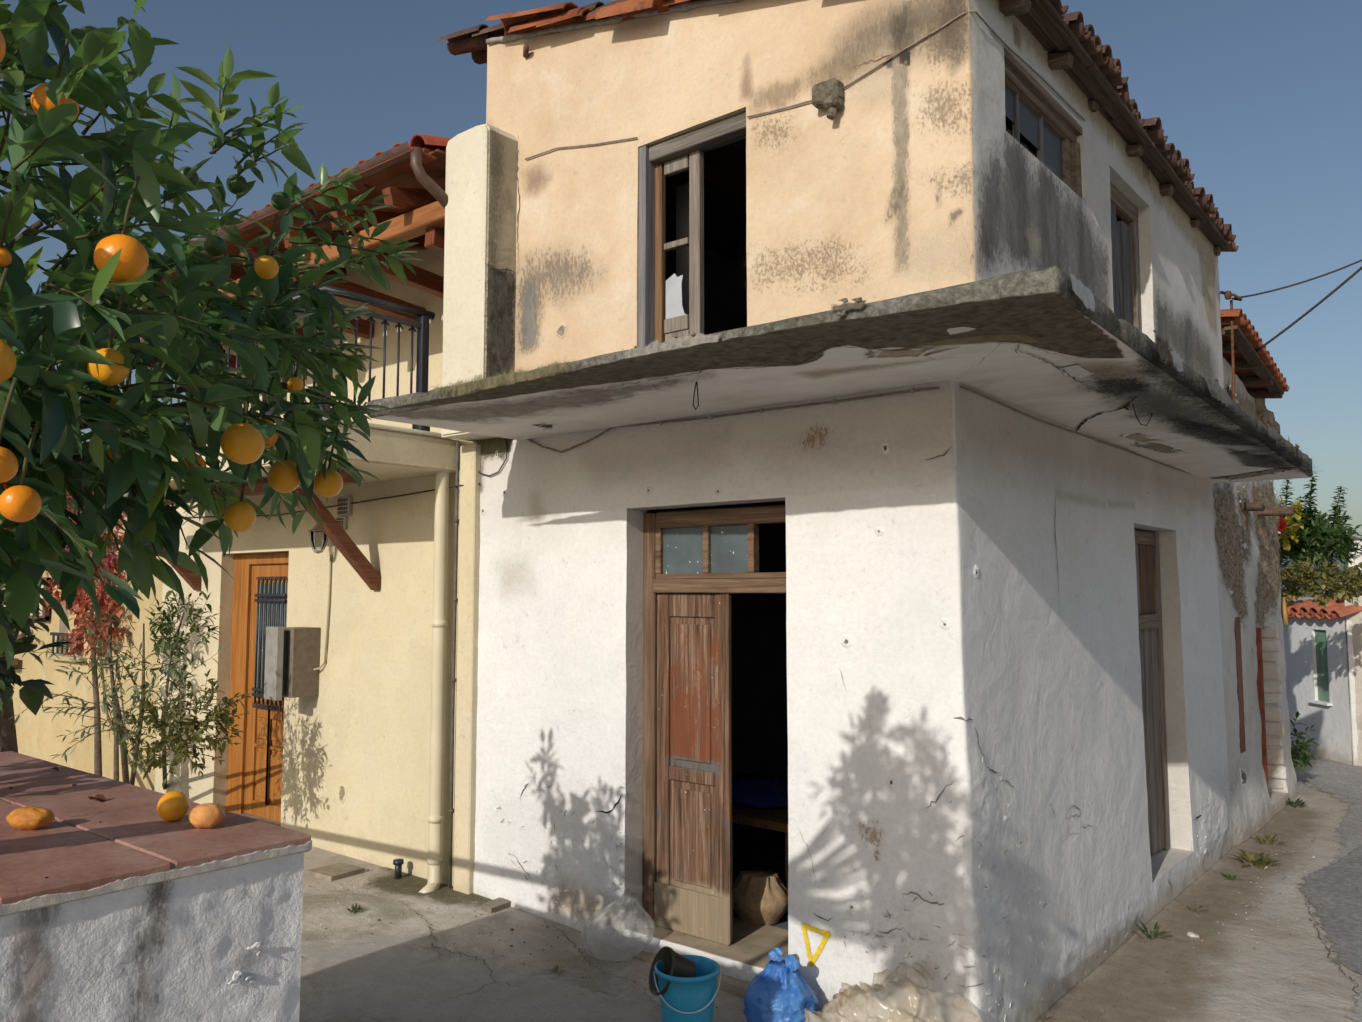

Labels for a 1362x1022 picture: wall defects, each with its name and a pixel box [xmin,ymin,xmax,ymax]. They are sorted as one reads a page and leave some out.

damp [887,60,909,269]
damp [378,128,1311,472]
crack [557,342,1139,431]
spalling [862,346,961,360]
crack [955,717,1016,792]
damp [7,907,51,1022]
damp [128,882,168,1022]
crack [395,898,521,1008]